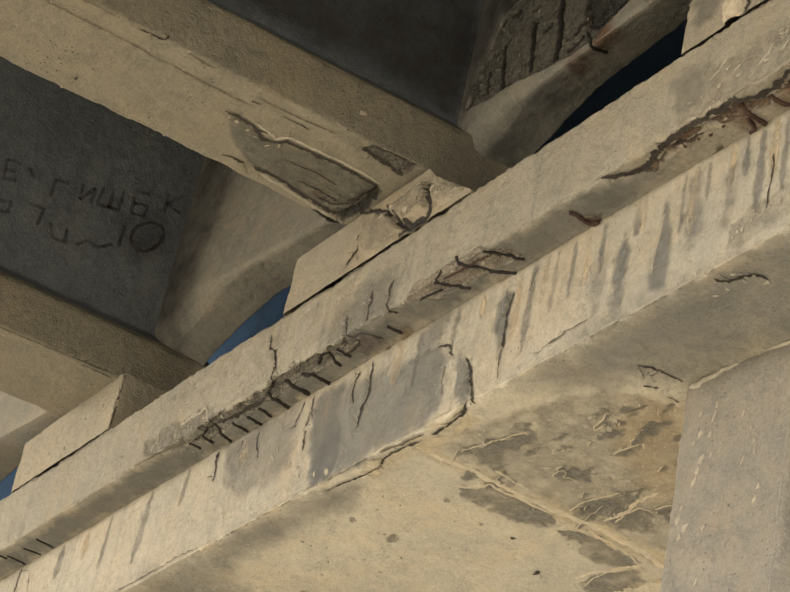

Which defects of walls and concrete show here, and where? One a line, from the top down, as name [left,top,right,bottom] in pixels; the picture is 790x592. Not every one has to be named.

spalling [466,0,629,110]
crack [46,0,439,315]
peeling [231,121,381,224]
leakage [731,122,788,213]
spalling [144,335,356,454]
crack [342,280,399,427]
crack [325,343,475,492]
spalling [401,246,525,305]
leakage [494,288,520,346]
leakage [612,241,629,308]
leakage [649,206,691,290]
crack [712,272,770,297]